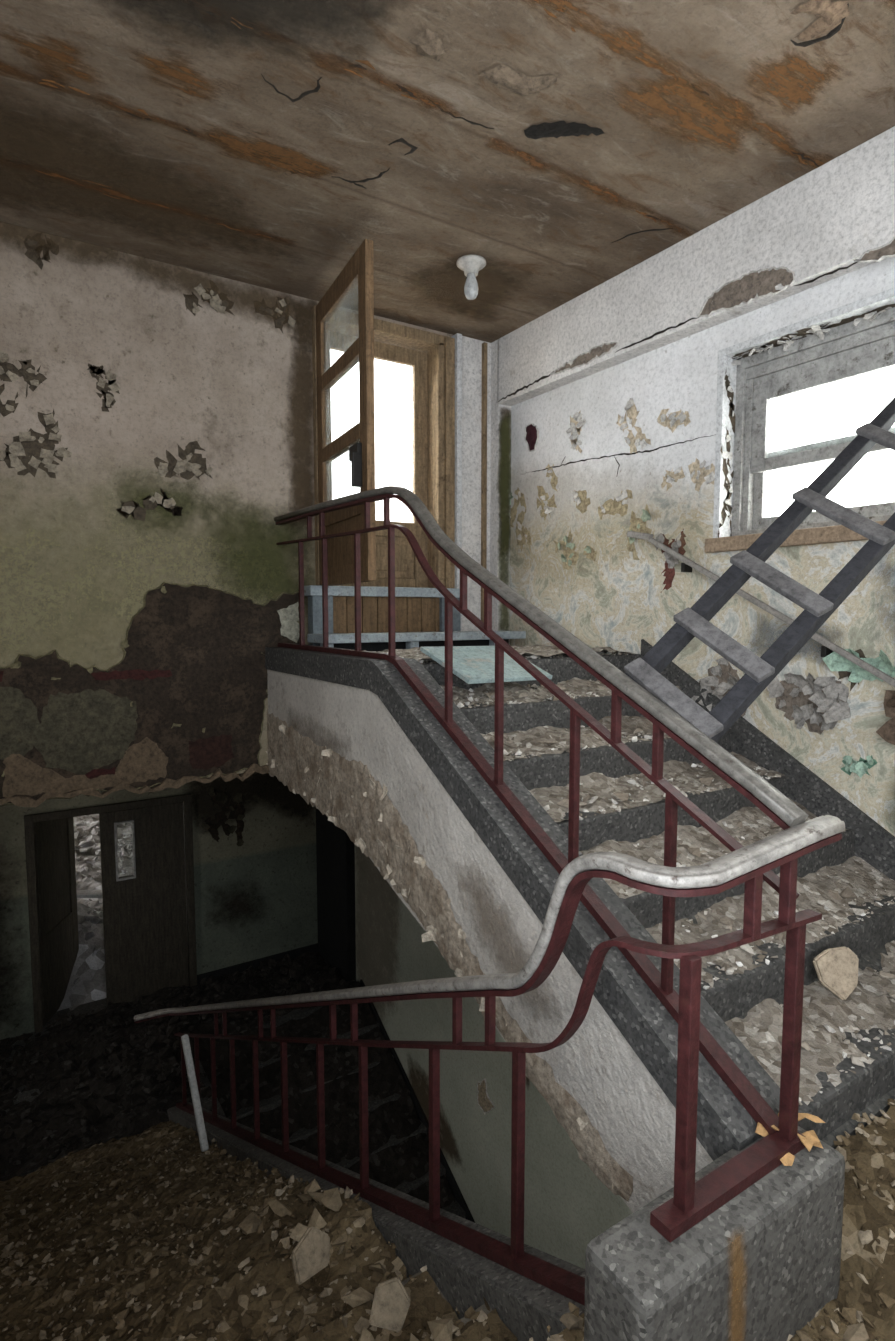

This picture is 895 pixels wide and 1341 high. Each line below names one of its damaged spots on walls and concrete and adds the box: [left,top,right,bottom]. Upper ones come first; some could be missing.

water stain [115,0,385,43]
spalling [524,121,604,139]
corrosion [523,0,837,168]
water stain [0,106,285,255]
corrosion [489,138,692,237]
water stain [416,259,521,321]
flaking render [698,266,795,317]
peeling [0,409,72,478]
water stain [0,221,314,599]
flaking render [524,423,539,452]
peeling [767,649,895,745]
flaking render [0,581,486,977]